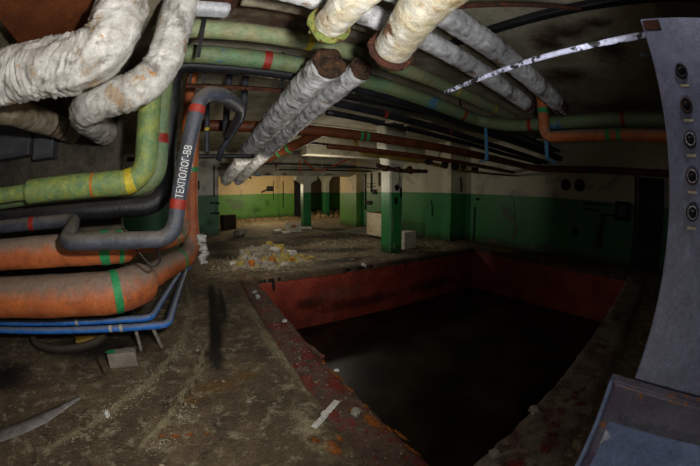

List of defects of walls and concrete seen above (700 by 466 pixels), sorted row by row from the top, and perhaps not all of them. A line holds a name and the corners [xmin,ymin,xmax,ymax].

spalling [351,403,369,418]